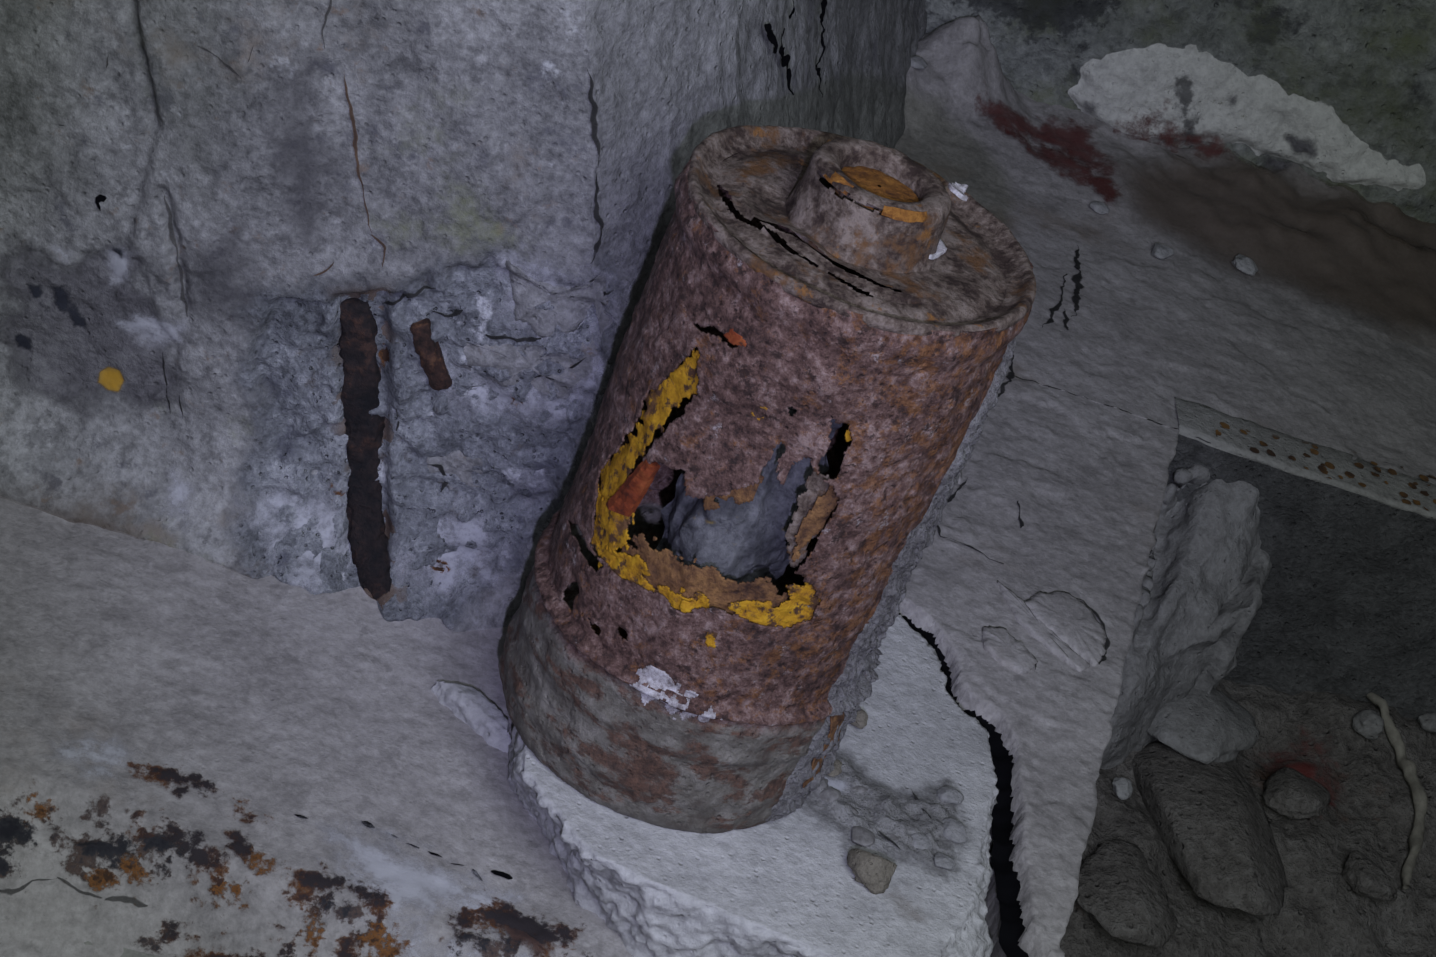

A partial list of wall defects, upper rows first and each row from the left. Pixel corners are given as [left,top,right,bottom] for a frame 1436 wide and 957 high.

crack [764,0,828,97]
rust [977,96,1119,202]
rust [1133,117,1225,158]
spalling [233,251,616,628]
rust [1216,422,1436,511]
rust [432,560,450,573]
crack [899,613,1029,957]
rust [0,762,410,957]
crack [879,831,901,850]
rust [439,890,593,957]